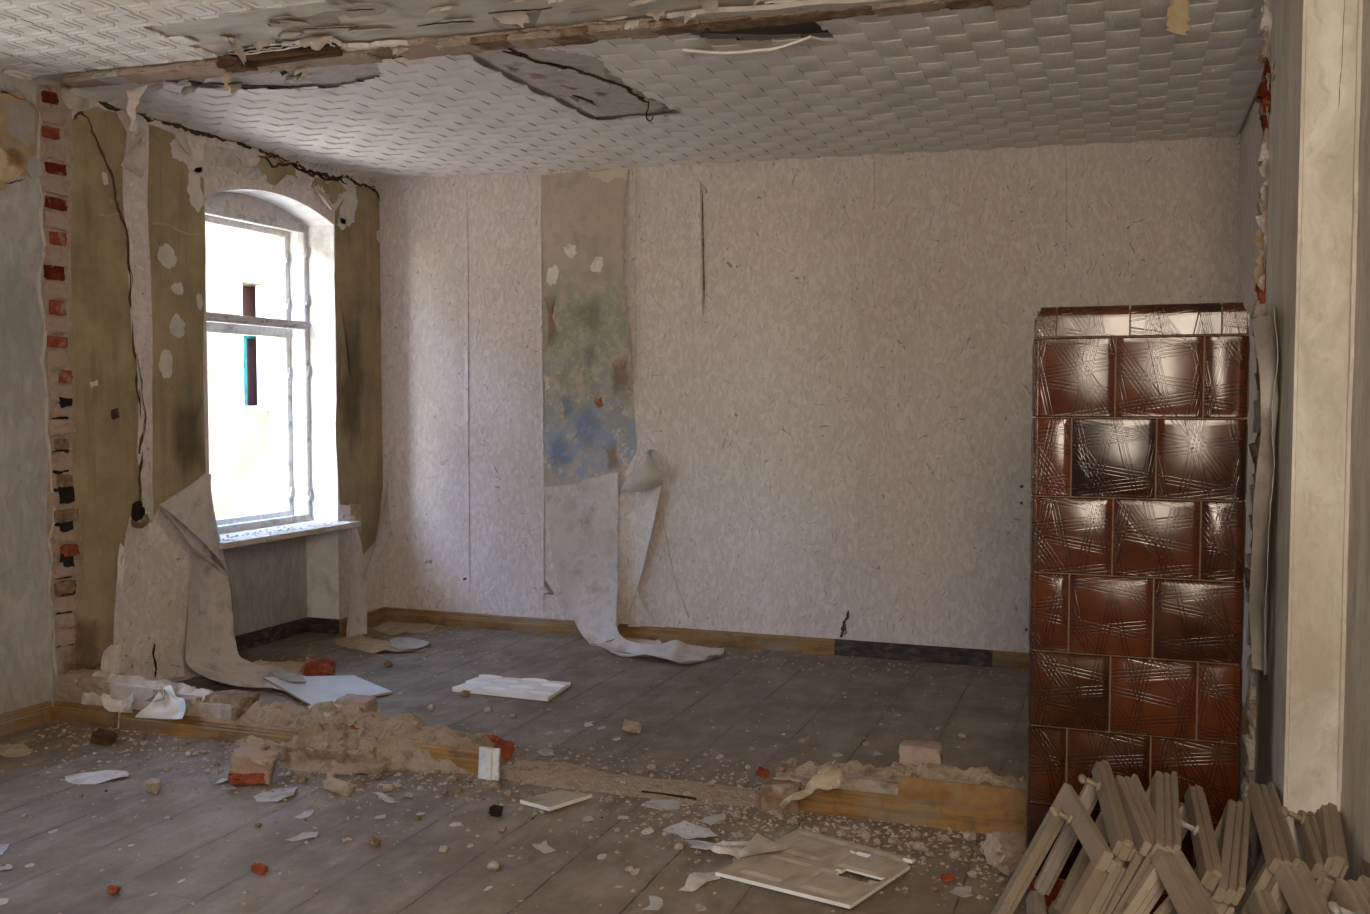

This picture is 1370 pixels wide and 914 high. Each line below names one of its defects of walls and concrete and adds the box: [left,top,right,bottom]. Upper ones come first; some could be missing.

flaking render [35,0,1031,728]
flaking render [1241,0,1272,801]